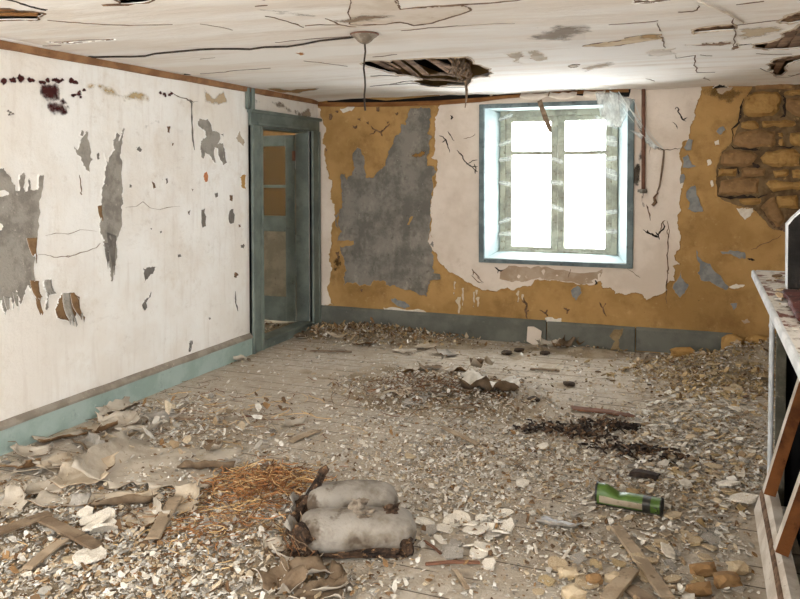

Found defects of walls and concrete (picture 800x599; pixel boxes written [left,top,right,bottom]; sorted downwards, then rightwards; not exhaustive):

crack [8,0,142,46]
crack [255,0,520,43]
crack [609,2,715,81]
peeling [0,167,85,327]
water stain [1,74,114,115]
peeling [73,127,132,282]
peeling [197,117,227,167]
crack [327,54,521,172]
peeling [318,72,733,312]
crack [605,89,631,97]
crack [644,205,670,303]
spalling [707,84,800,289]